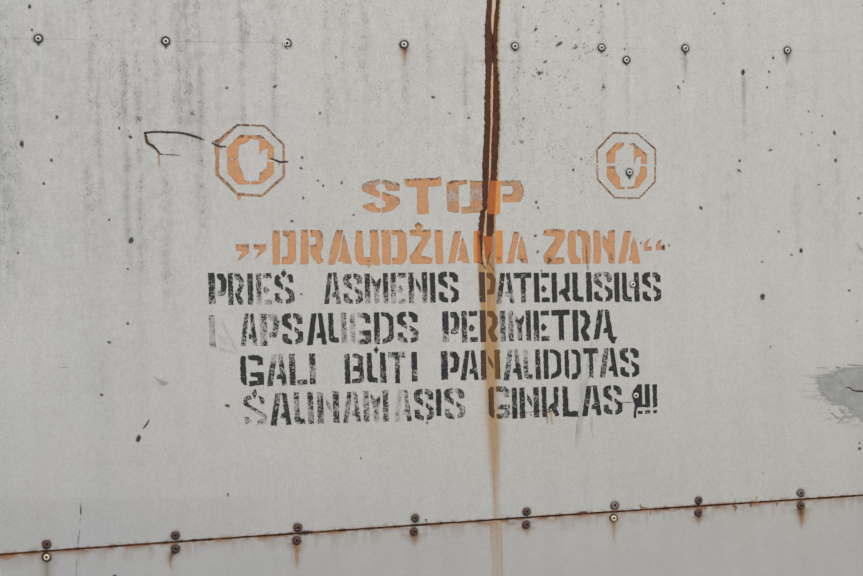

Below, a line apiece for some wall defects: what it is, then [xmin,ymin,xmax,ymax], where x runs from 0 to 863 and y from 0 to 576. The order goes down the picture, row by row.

crack [144,131,226,155]
corrosion [479,214,496,402]
peeling [817,367,863,422]
corrosion [0,494,863,562]